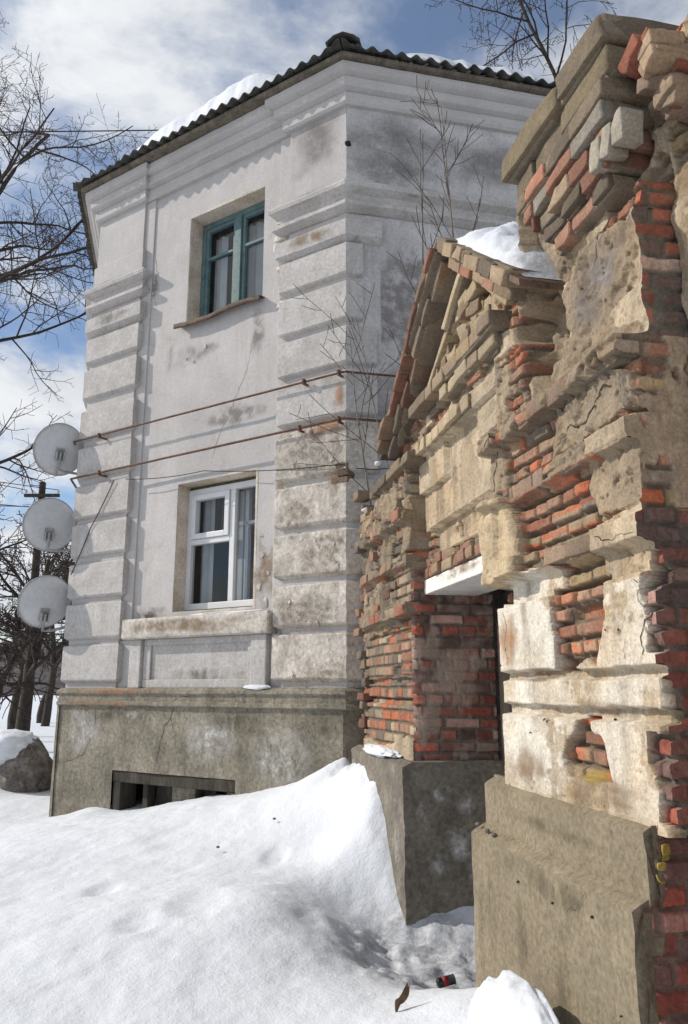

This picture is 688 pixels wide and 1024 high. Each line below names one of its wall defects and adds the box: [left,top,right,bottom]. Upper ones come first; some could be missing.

spalling [467,347,501,387]
spalling [410,405,443,449]
crack [555,384,611,447]
spalling [355,540,383,562]
spalling [364,581,399,613]
spalling [638,548,674,653]
spalling [562,715,617,782]